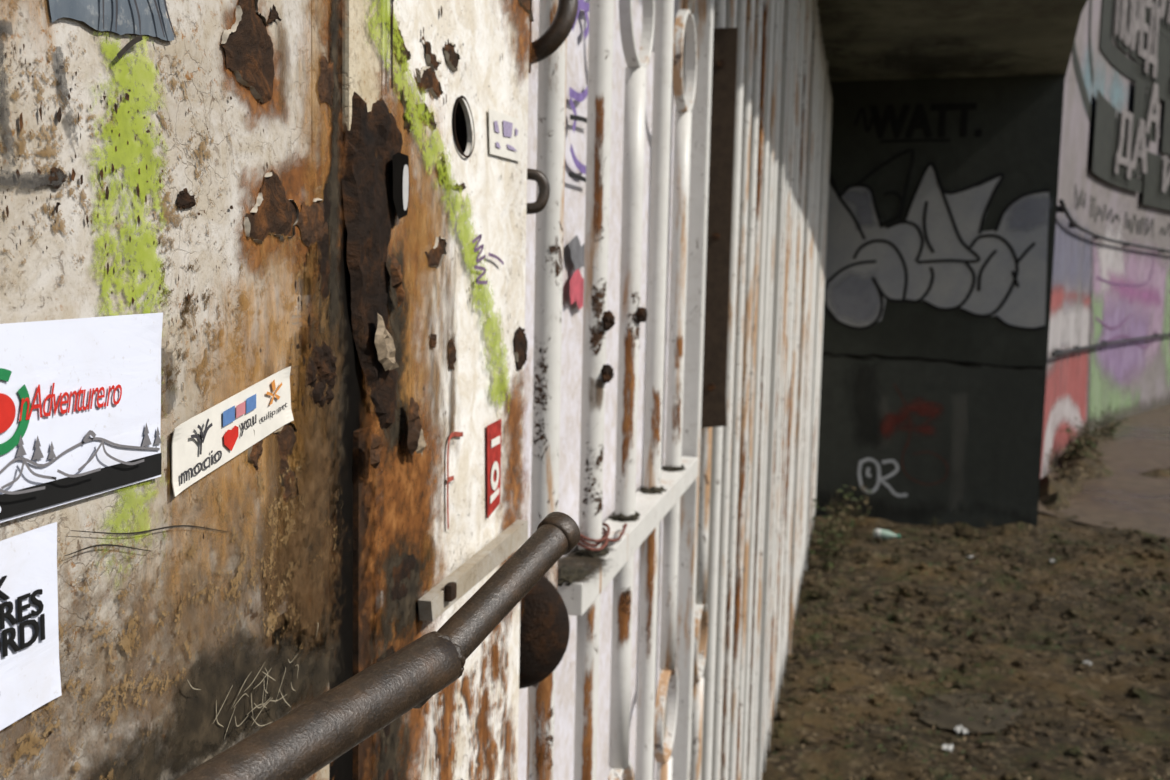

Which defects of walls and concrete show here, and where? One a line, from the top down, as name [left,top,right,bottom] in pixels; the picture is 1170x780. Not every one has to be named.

rust [621,292,640,474]
rust [535,672,554,780]